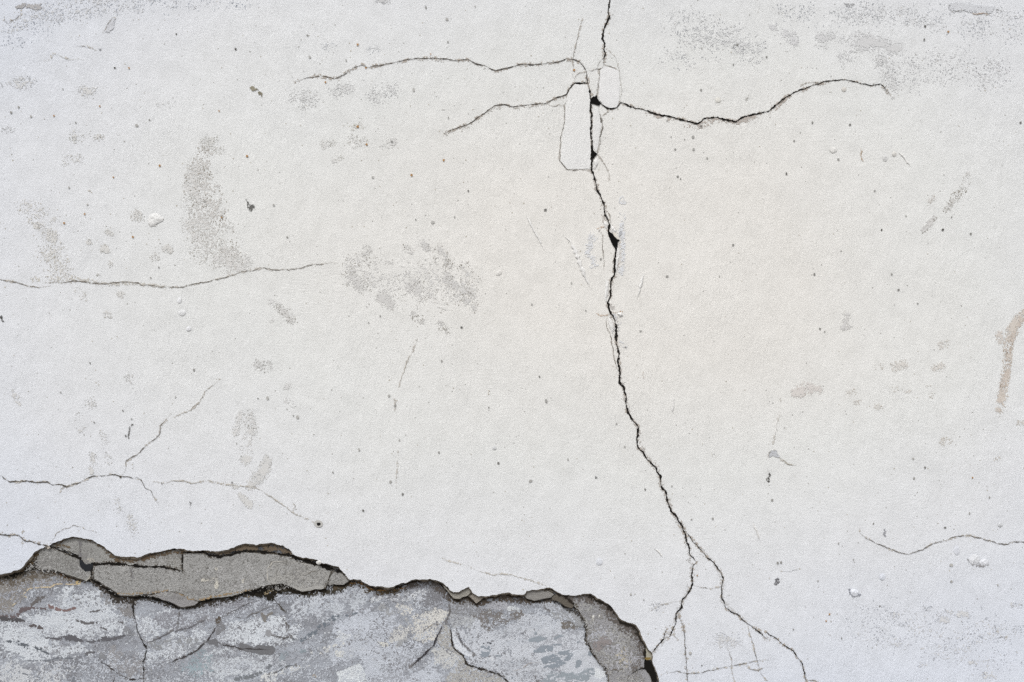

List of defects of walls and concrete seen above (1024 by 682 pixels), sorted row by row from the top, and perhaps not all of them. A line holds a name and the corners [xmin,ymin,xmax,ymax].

crack [0,262,327,288]
crack [295,0,891,682]
crack [2,378,314,523]
peeling [0,537,659,682]
crack [859,530,1020,554]